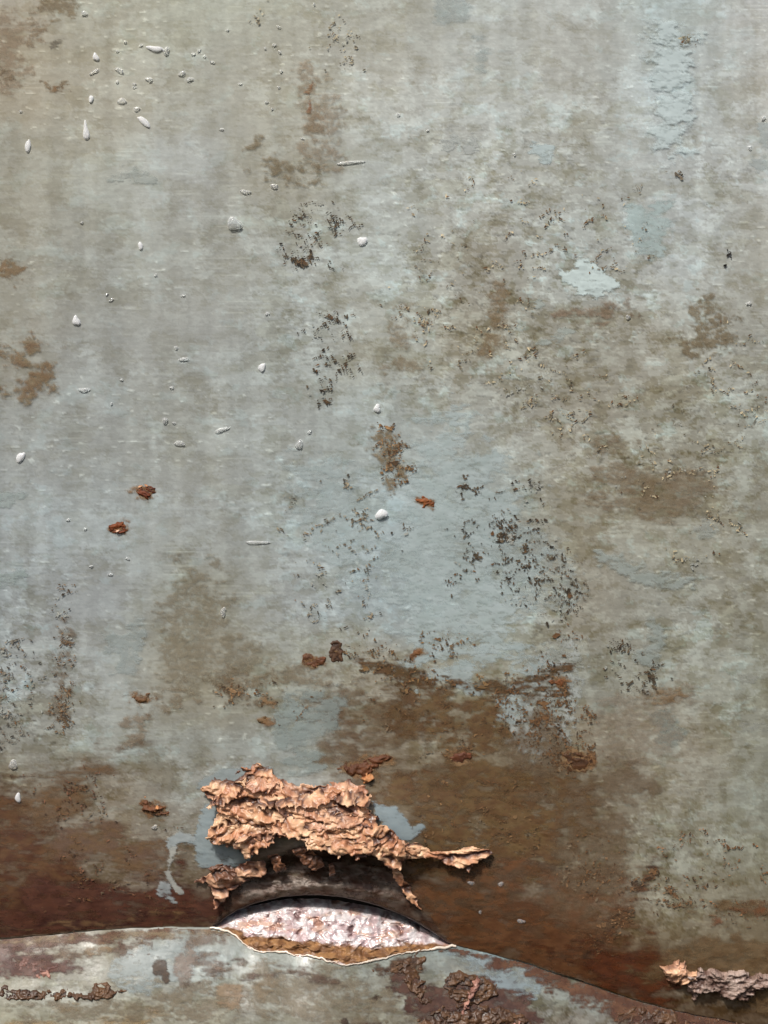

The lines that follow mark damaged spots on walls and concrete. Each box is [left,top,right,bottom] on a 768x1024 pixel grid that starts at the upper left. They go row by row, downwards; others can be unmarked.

rust [0,331,57,405]
rust [0,422,768,1024]
peeling [197,766,252,789]
peeling [157,804,253,903]
peeling [372,801,425,840]